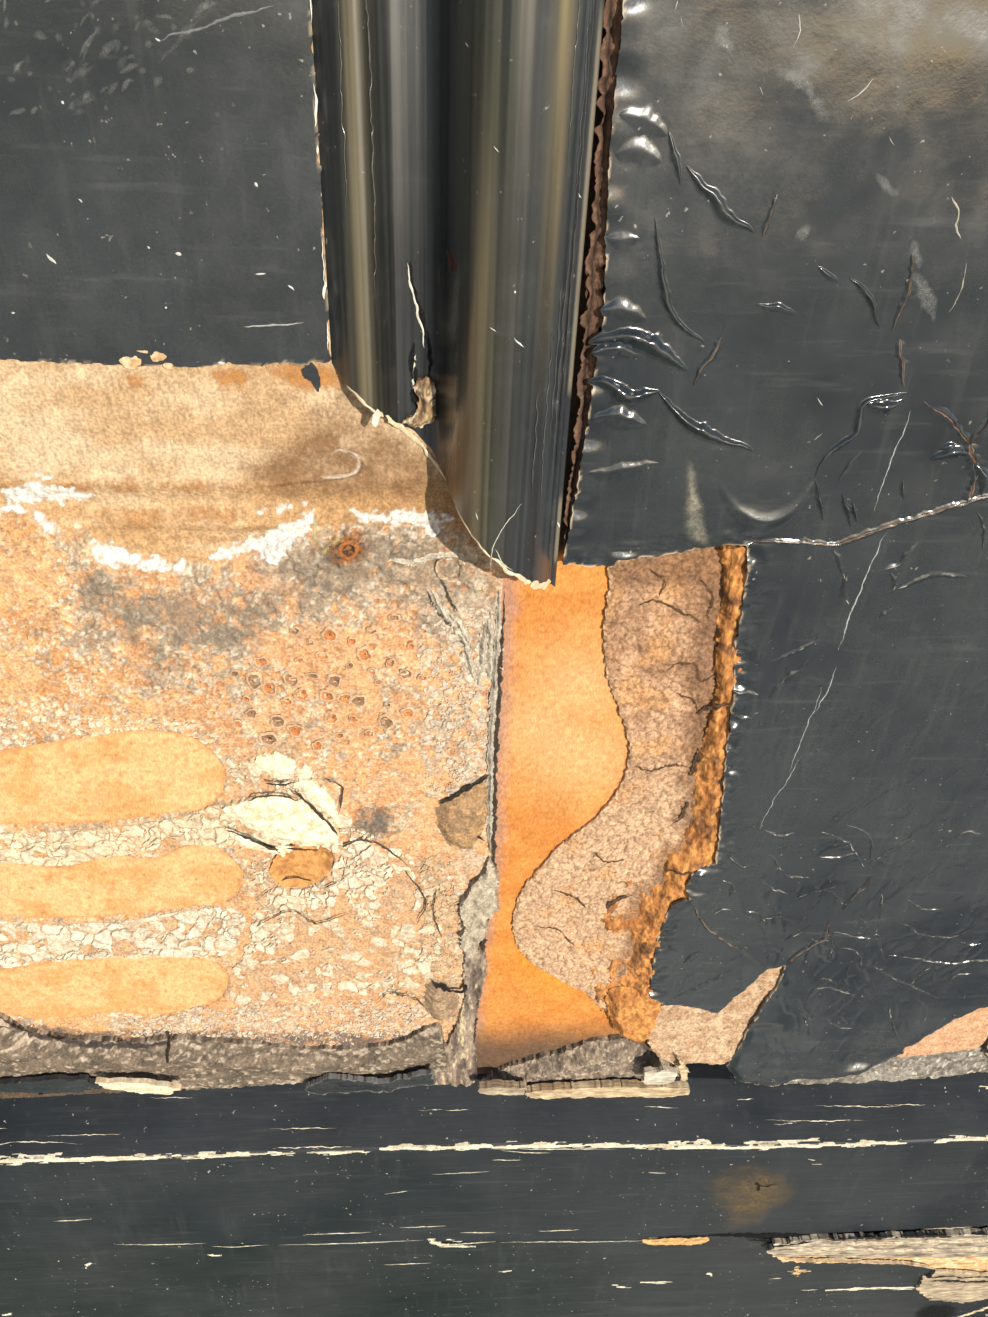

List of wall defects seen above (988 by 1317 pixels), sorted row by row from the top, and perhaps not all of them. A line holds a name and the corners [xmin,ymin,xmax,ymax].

crack [563,0,623,543]
crack [747,253,988,561]
damp [0,472,96,533]
damp [208,421,421,566]
corrosion [313,523,367,566]
efflorescence [349,508,455,538]
crack [426,579,505,867]
peeling [0,715,463,1039]
crack [255,779,442,937]
peeling [512,544,784,1065]
spalling [0,1104,926,1166]
peeling [642,1237,709,1245]